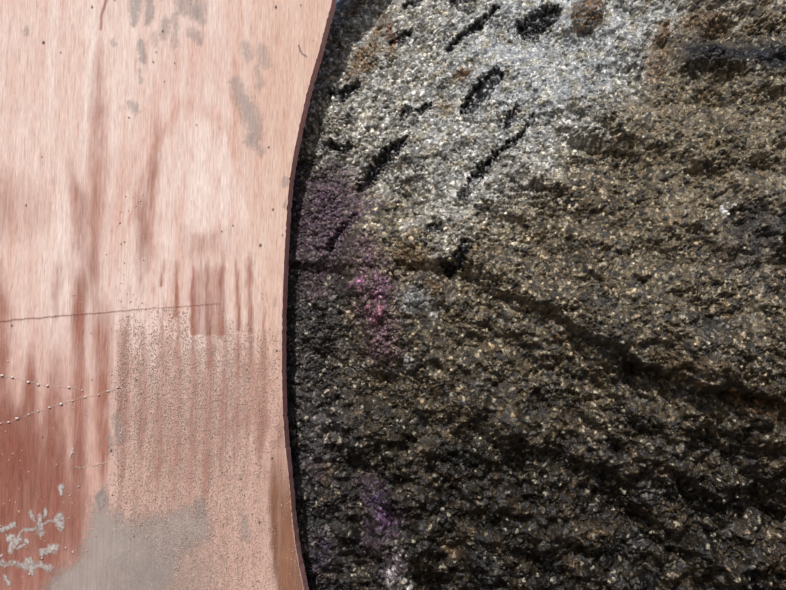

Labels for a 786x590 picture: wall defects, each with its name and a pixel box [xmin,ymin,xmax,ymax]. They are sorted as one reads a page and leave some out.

damp [0,409,63,590]
damp [75,299,84,463]
damp [98,371,108,469]